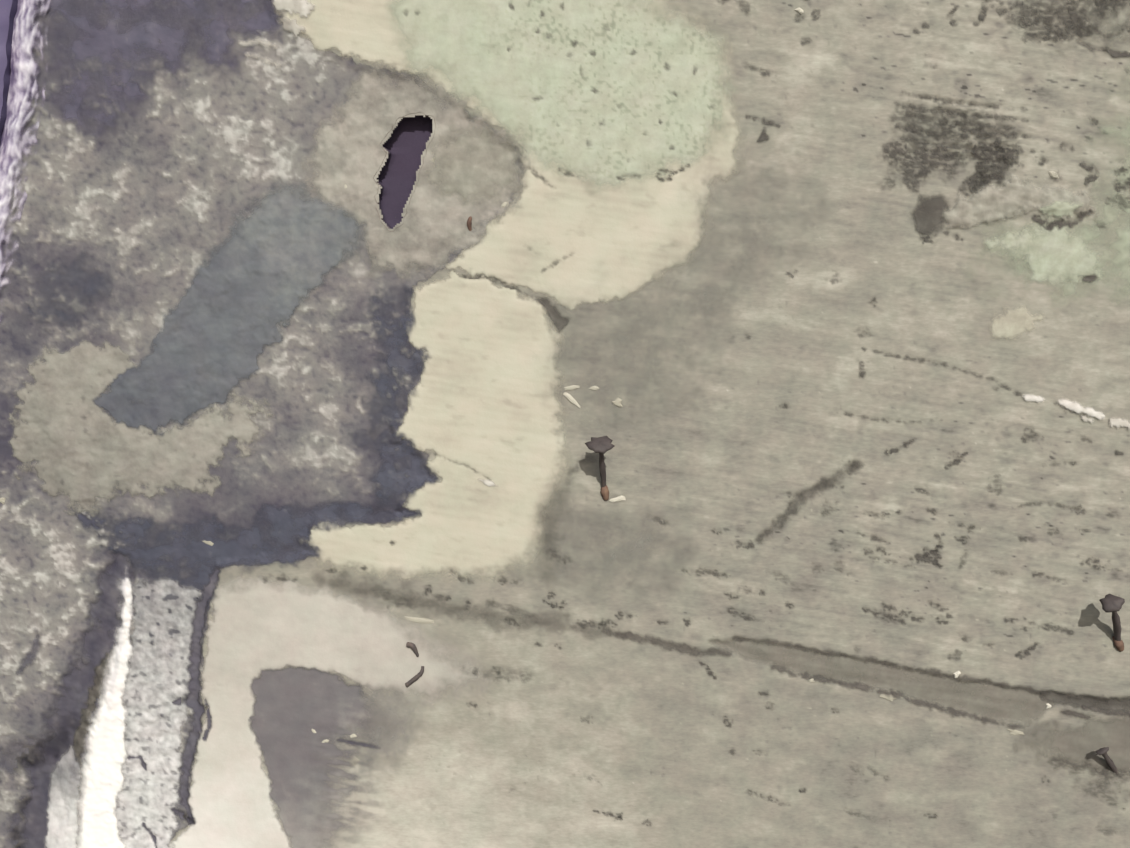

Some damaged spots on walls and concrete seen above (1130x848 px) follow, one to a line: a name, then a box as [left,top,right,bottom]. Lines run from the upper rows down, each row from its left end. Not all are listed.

water stain [391,0,723,185]
water stain [896,96,1035,192]
spalling [0,0,740,848]
water stain [250,667,408,848]